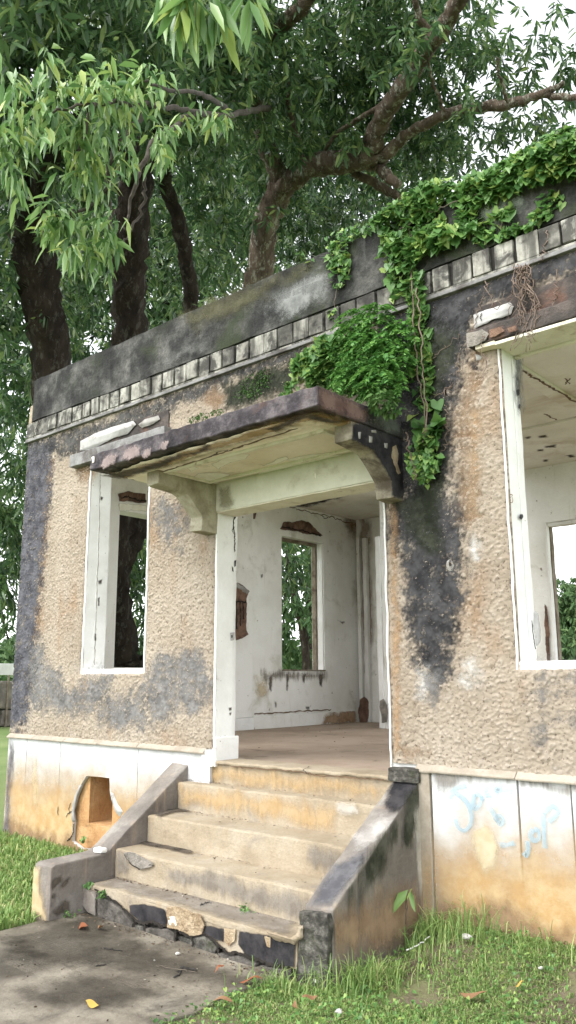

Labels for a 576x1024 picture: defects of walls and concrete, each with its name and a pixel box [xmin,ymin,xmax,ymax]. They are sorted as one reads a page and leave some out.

peeling [466,303,517,347]
peeling [80,416,168,467]
spalling [118,491,147,512]
damp [319,251,576,706]
damp [10,346,306,734]
spalling [280,520,322,537]
spalling [230,583,250,641]
damp [261,672,325,690]
damp [3,746,83,852]
damp [435,773,472,787]
damp [103,782,576,967]
spalling [166,906,204,936]